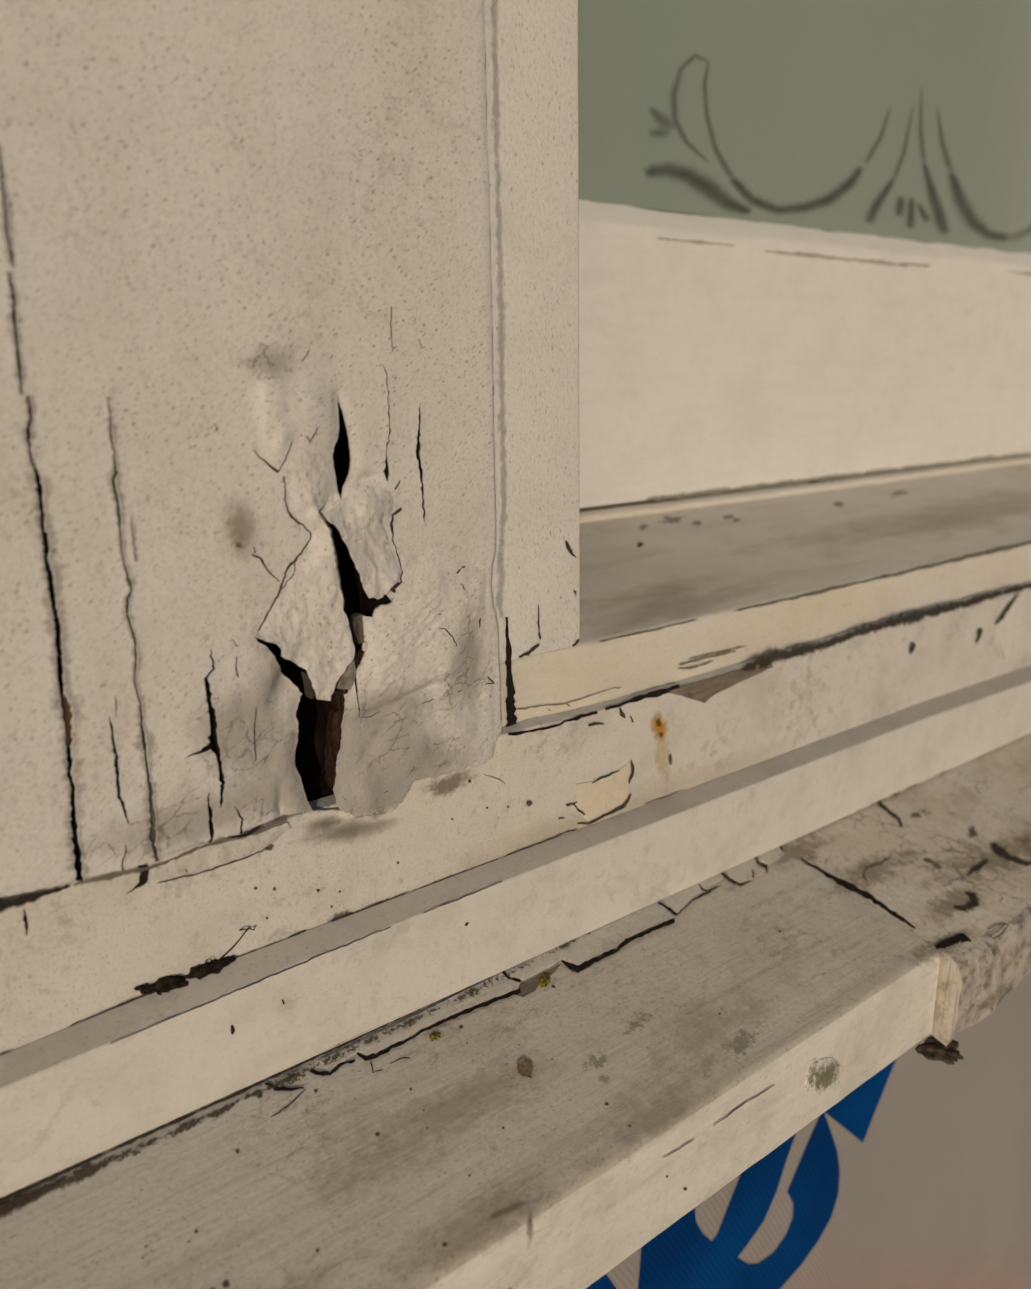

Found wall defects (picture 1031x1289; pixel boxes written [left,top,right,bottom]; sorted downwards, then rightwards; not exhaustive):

crack [0,157,83,881]
crack [107,397,318,894]
peeling [996,589,1031,660]
peeling [573,762,631,822]
corrosion [652,714,672,769]
crack [878,801,902,827]
peeling [320,847,785,1071]
crack [561,843,1031,973]